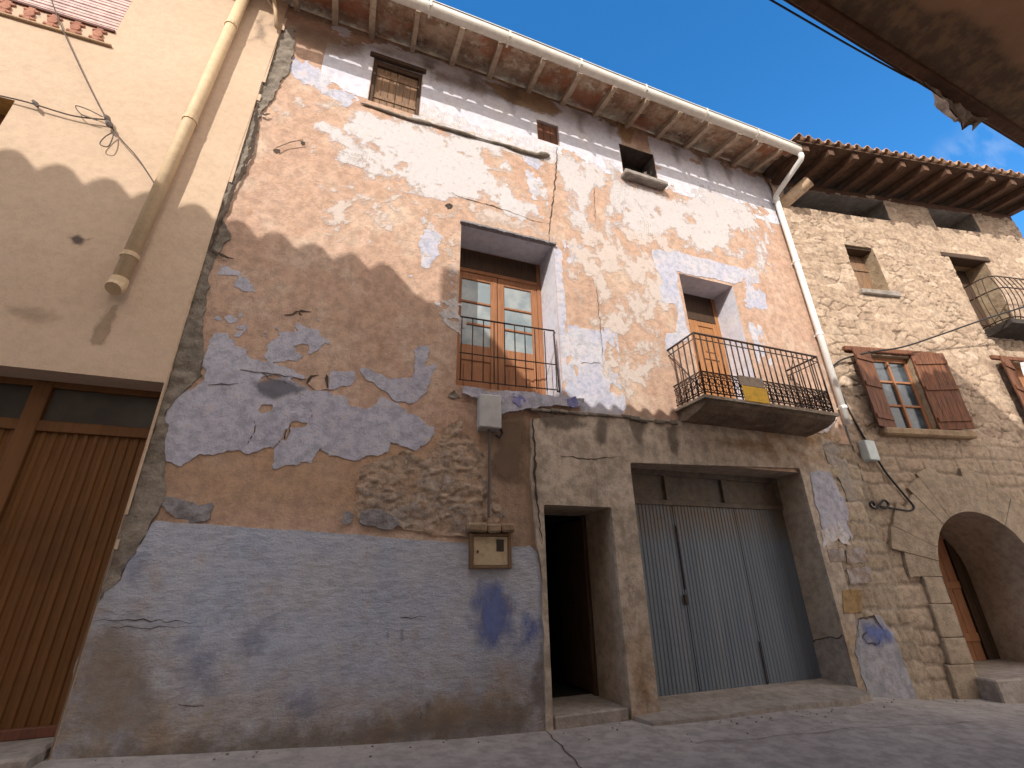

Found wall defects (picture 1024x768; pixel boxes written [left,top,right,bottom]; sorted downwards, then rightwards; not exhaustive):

crack [451,148,558,241]
peeling [100,25,781,600]
crack [210,369,329,388]
crack [532,419,542,537]
crack [96,618,190,630]
water stain [473,585,510,647]
peeling [810,470,918,699]